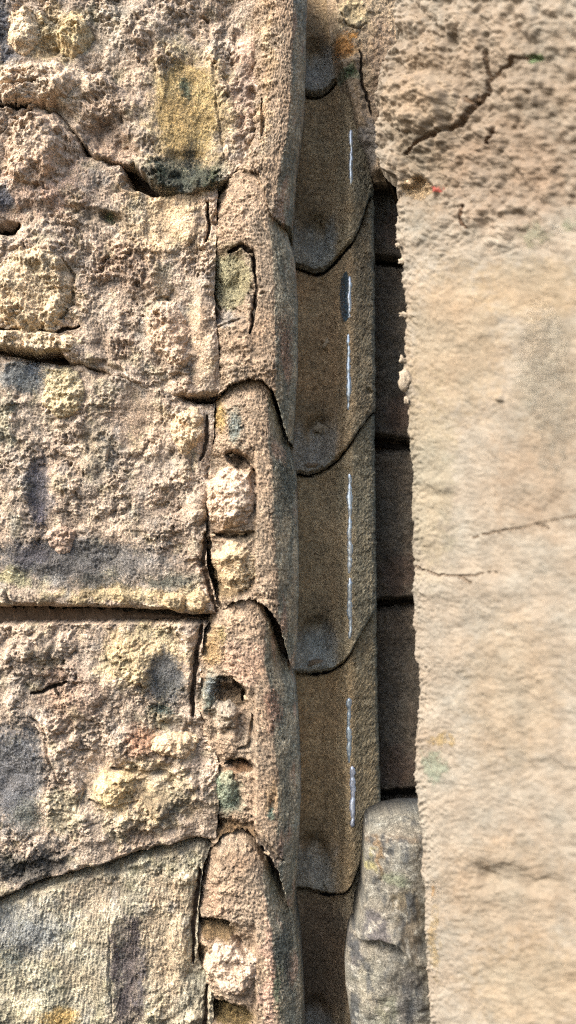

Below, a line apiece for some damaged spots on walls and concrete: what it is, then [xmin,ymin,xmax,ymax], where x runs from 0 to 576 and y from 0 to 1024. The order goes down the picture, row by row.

crack [0,102,27,111]
crack [359,50,372,115]
crack [403,50,528,155]
crack [126,172,162,198]
leakage [184,137,221,191]
peeling [398,355,412,404]
crack [472,515,576,538]
crack [415,565,498,583]